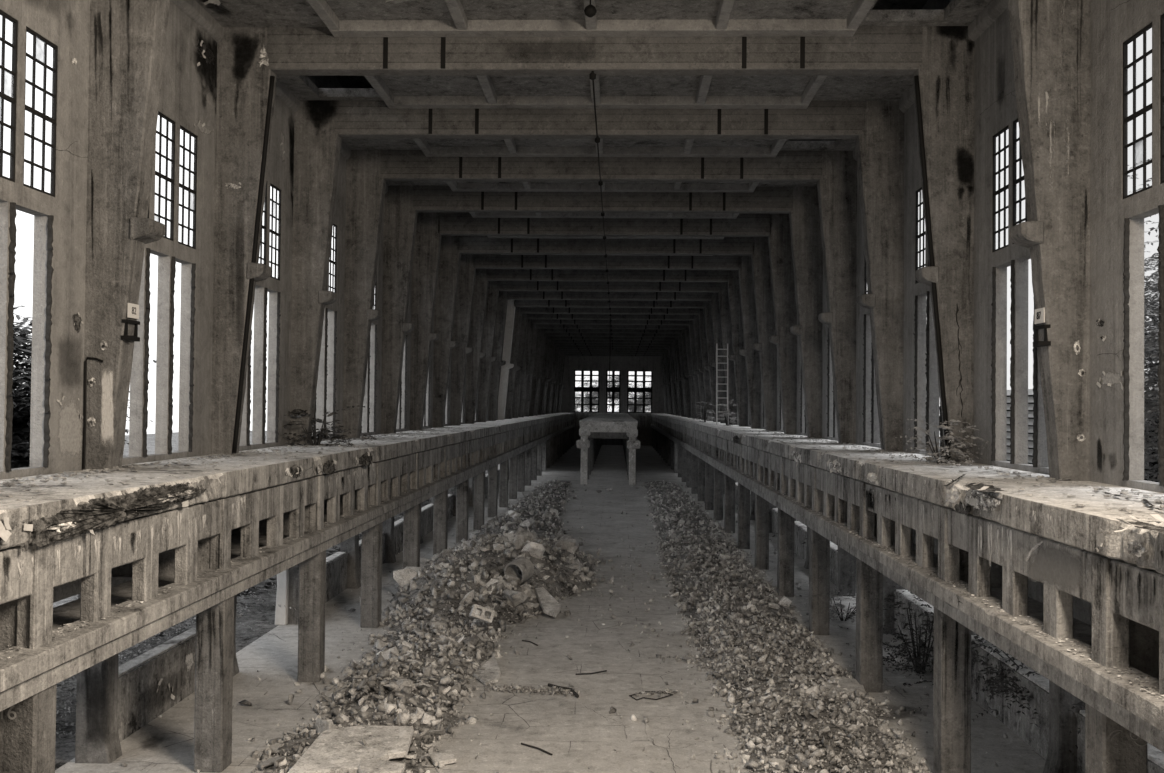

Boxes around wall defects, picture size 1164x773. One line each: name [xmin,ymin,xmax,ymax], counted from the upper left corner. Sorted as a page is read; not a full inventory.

damp [957,149,974,198]
spalling [0,482,206,552]
spalling [946,481,1008,515]